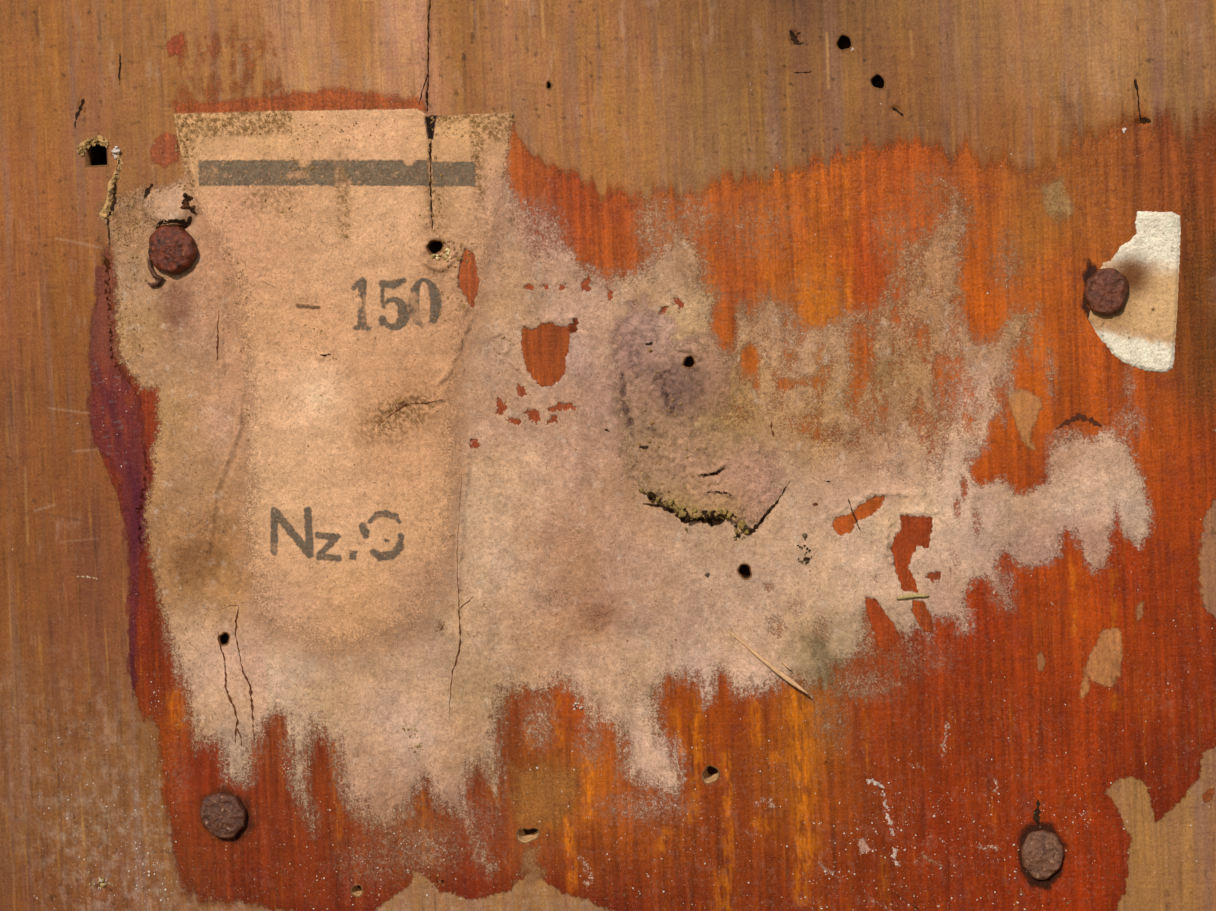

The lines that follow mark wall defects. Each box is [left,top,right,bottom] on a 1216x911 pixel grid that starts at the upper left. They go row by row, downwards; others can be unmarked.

peeling [76,135,120,159]
crack [419,0,433,230]
peeling [180,193,196,213]
peeling [431,248,479,308]
corrosion [1082,259,1097,320]
peeling [496,318,578,425]
peeling [833,496,884,535]
peeling [891,515,941,633]
peeling [865,598,900,652]
crack [218,605,255,747]
spalling [1080,628,1123,698]
corrosion [1018,823,1066,889]